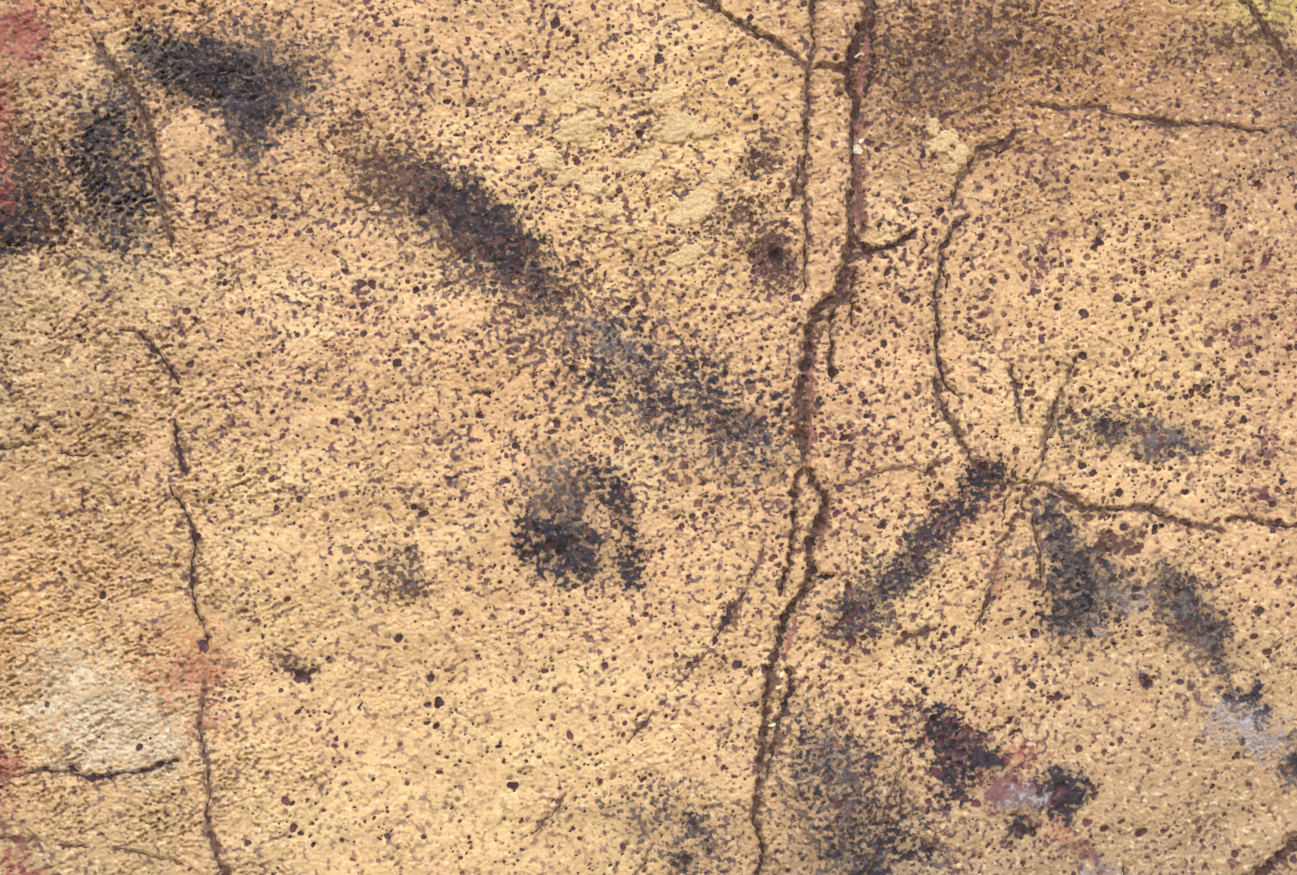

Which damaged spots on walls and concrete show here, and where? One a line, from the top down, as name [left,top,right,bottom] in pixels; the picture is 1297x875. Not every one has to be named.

crack [0,422,231,875]
crack [119,326,181,385]
crack [530,794,566,834]
crack [628,0,1297,875]